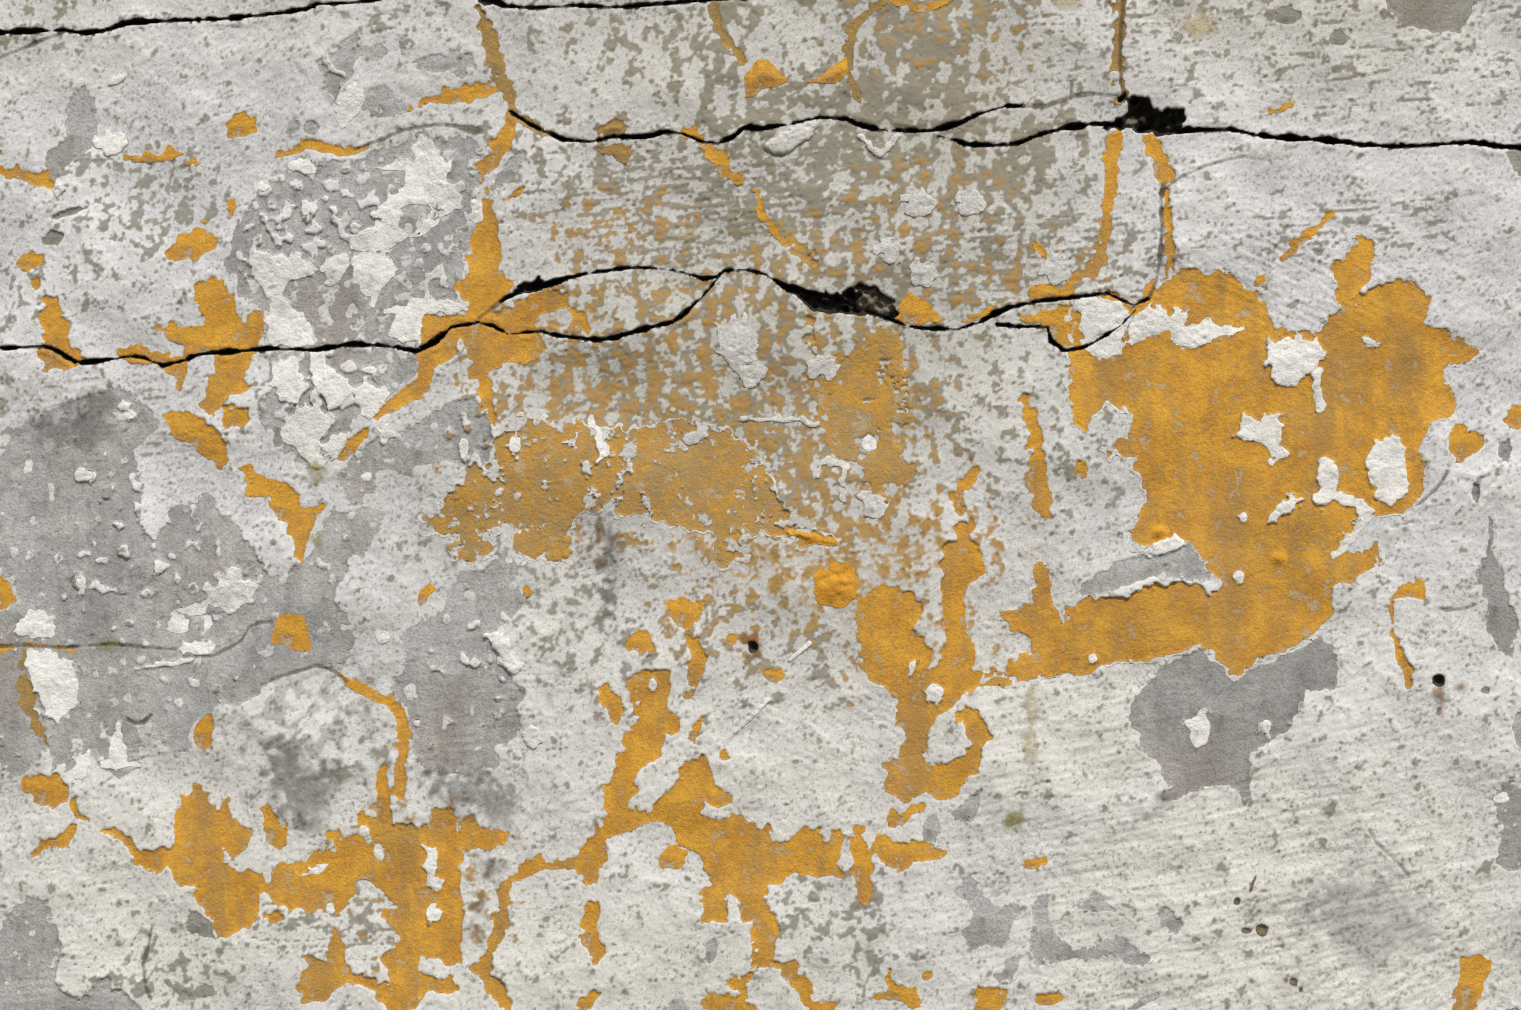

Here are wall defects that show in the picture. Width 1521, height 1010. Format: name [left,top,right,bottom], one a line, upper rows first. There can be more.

flaking render [1386,0,1478,34]
crack [0,0,1521,368]
flaking render [0,0,842,1010]
peeling [469,92,1484,1010]
flaking render [1471,483,1519,656]
flaking render [1512,711,1521,747]
flaking render [1491,780,1521,871]
peeling [1451,953,1492,1010]